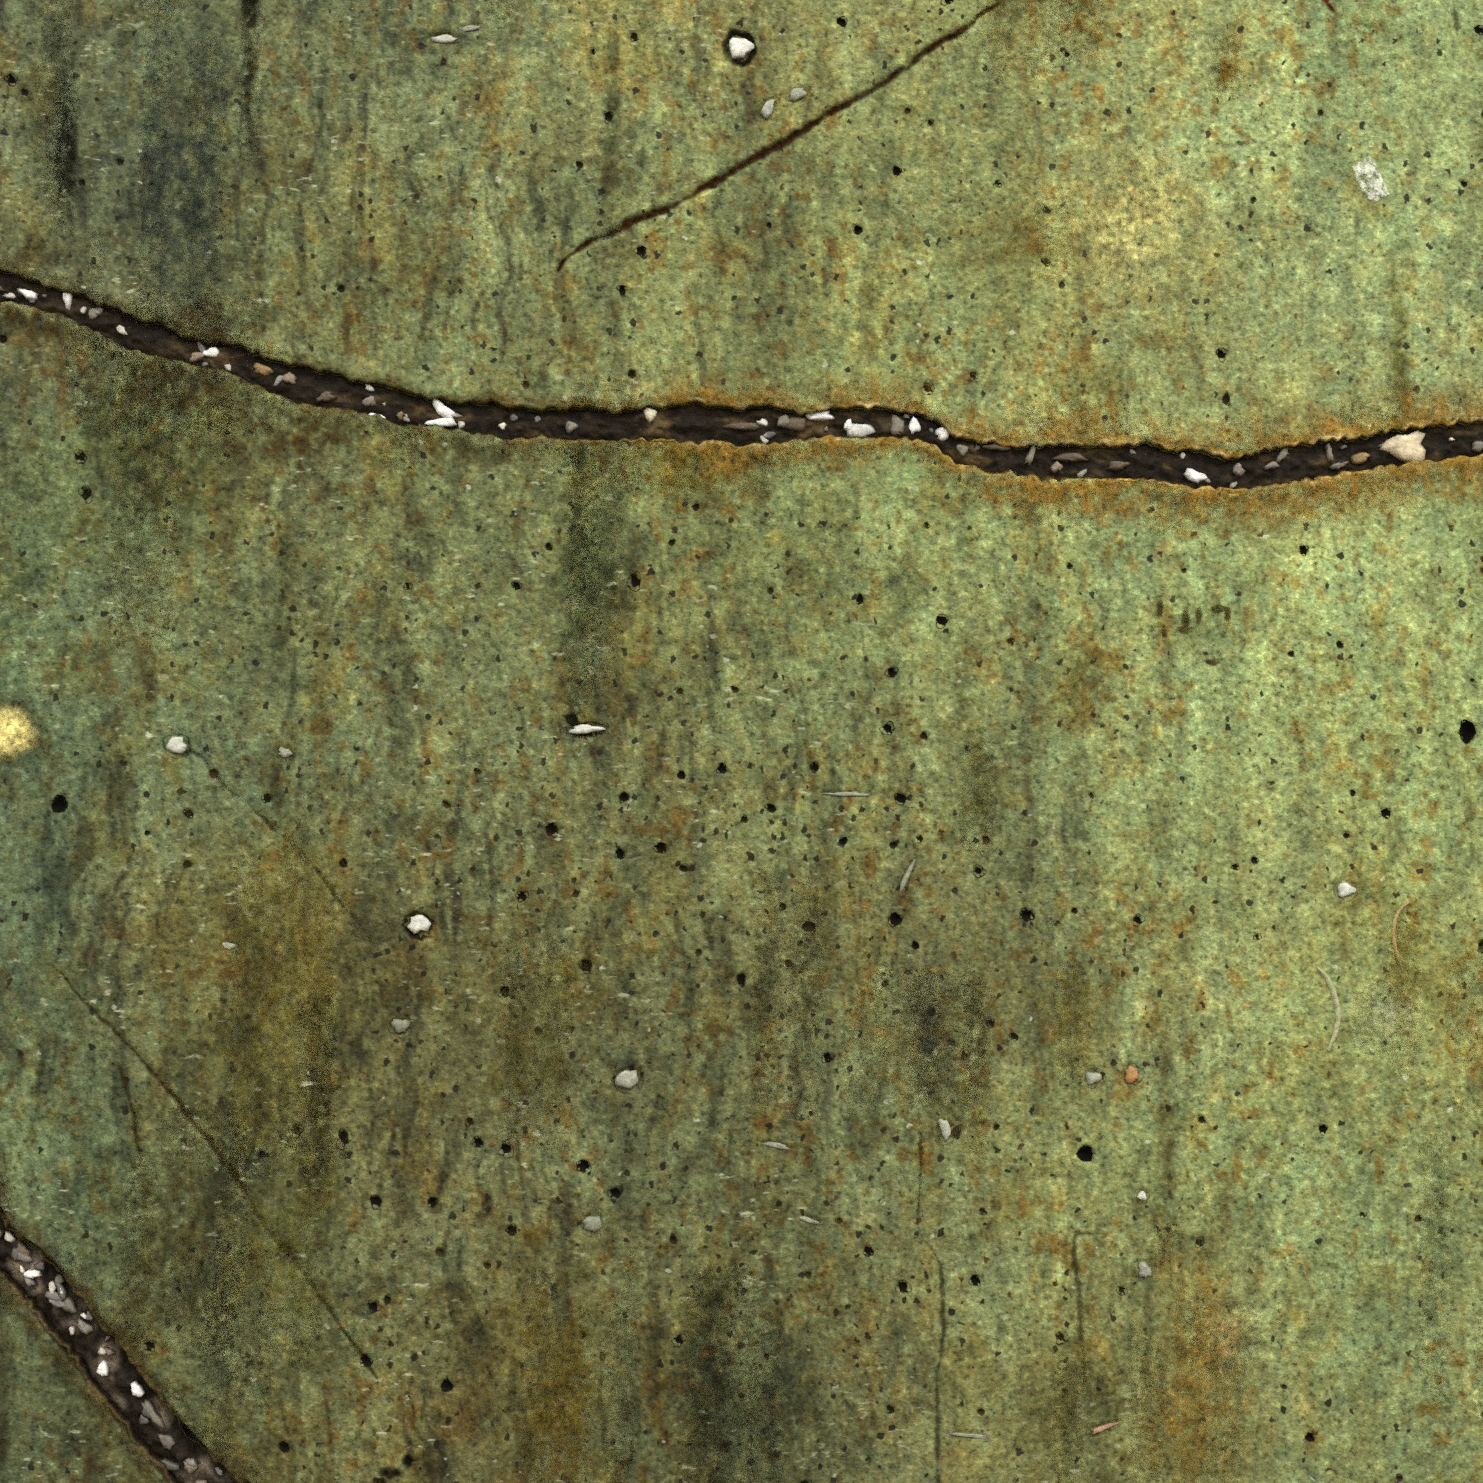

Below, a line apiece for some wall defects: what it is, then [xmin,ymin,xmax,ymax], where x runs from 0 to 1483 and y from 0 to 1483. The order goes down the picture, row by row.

leakage [56,106,76,207]
leakage [242,0,258,114]
crack [556,0,1003,272]
crack [0,242,1483,520]
crack [0,1180,249,1483]